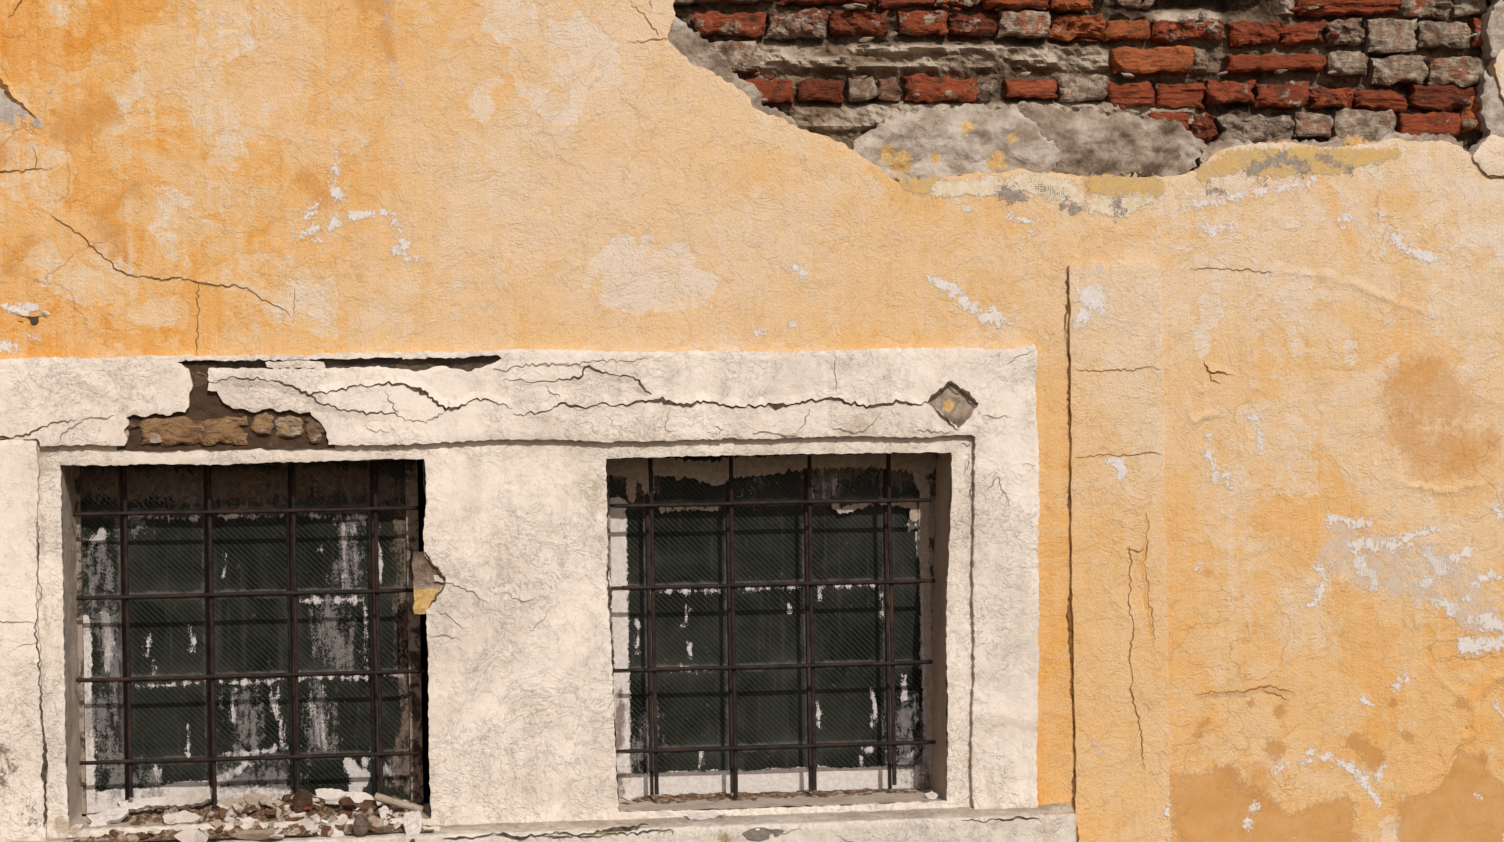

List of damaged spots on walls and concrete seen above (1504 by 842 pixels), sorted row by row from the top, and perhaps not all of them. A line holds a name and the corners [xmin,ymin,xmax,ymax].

peeling [0,88,43,128]
crack [0,69,51,173]
flaking render [667,0,1504,184]
flaking render [929,383,977,428]
crack [51,215,1159,842]
flaking render [412,551,444,614]
peeling [1307,513,1504,657]